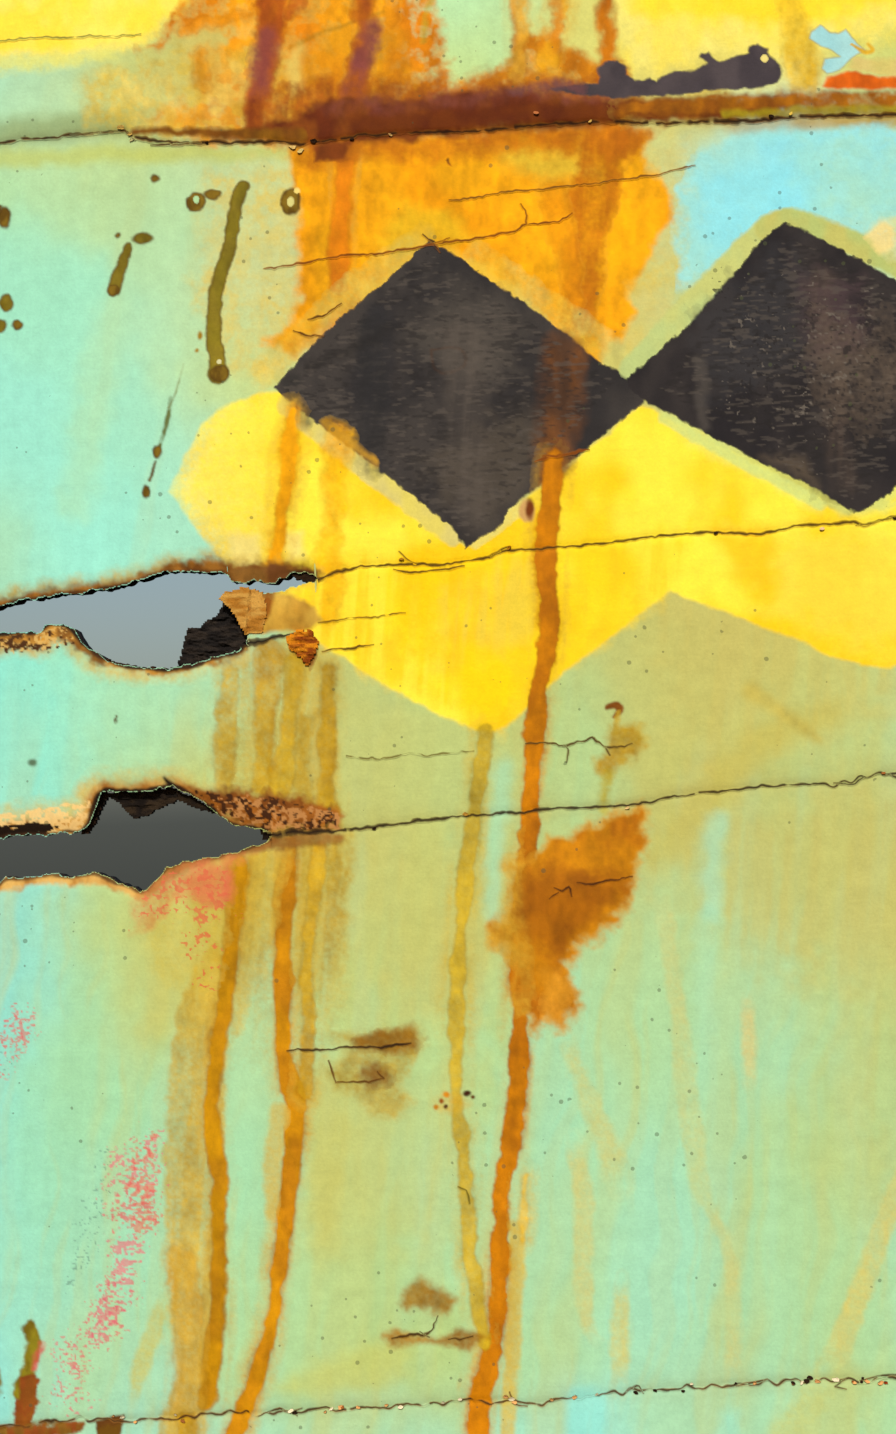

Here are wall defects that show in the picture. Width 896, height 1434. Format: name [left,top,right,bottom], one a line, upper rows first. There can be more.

crack [0,111,896,154]
crack [263,164,696,270]
rust [71,0,896,632]
crack [317,514,896,583]
spalling [0,545,329,689]
crack [240,611,406,653]
crack [525,736,633,763]
crack [263,770,896,839]
spalling [0,758,349,998]
rust [136,437,655,1434]
rust [94,1412,127,1434]
crack [0,1373,896,1429]